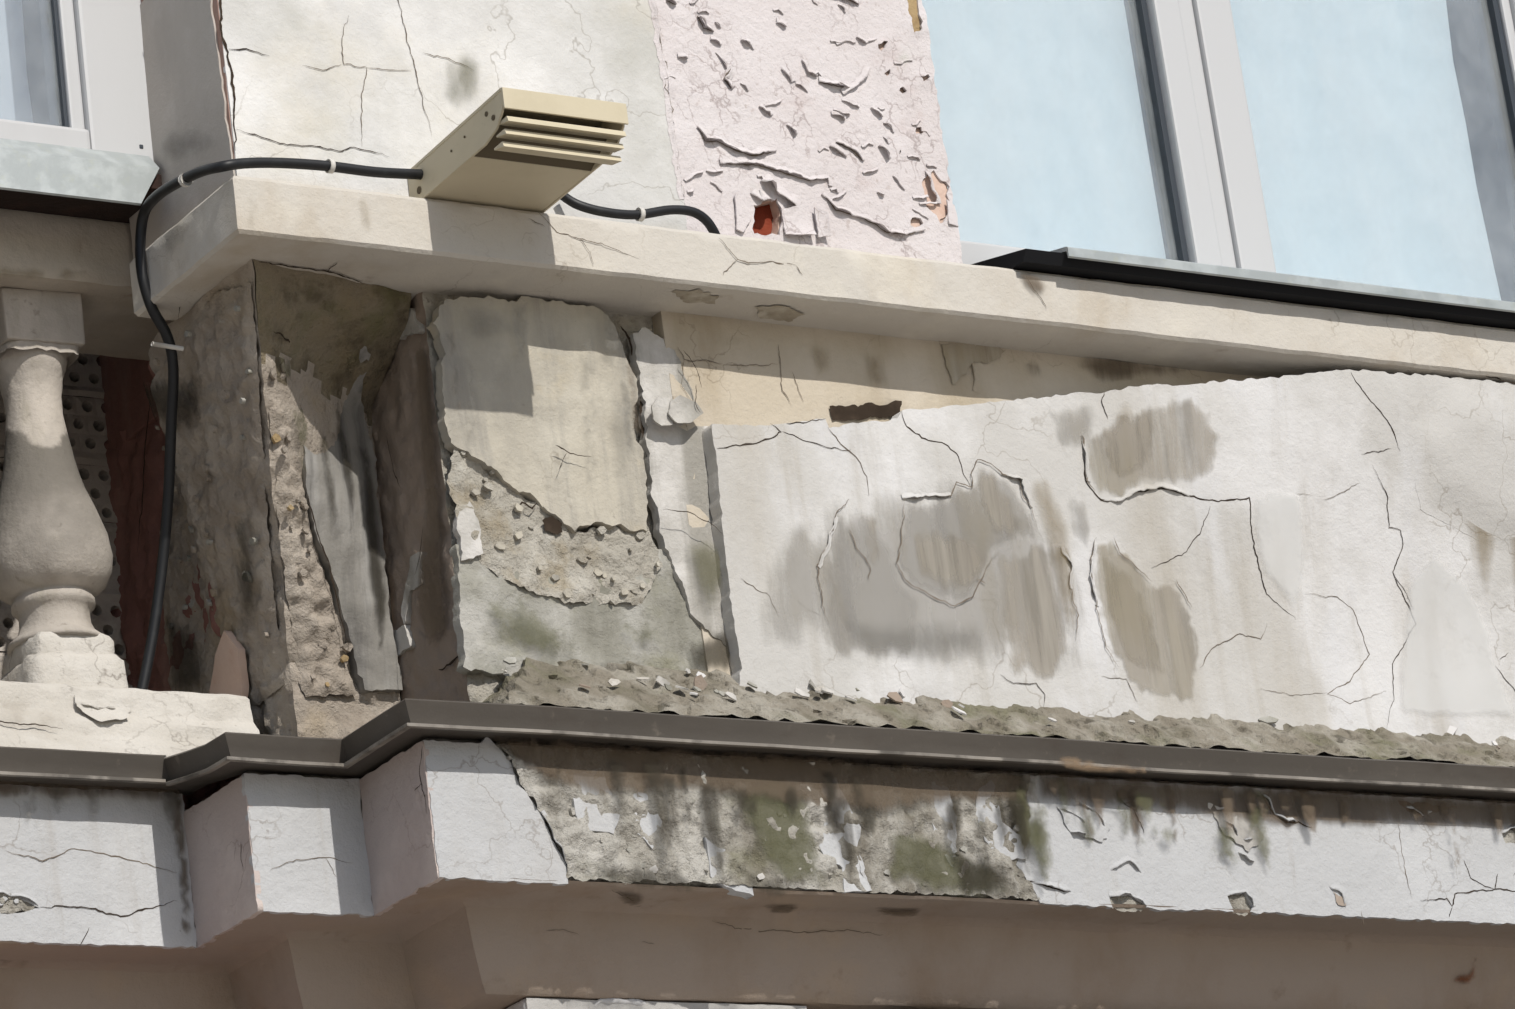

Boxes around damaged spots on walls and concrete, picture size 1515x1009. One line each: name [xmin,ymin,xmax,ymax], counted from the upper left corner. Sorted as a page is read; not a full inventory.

crack [219,0,471,156]
crack [648,0,685,199]
spalling [684,59,959,238]
spalling [150,283,358,707]
spalling [446,448,662,605]
peeling [651,395,703,426]
crack [902,415,970,485]
crack [1081,373,1416,725]
spalling [0,889,39,914]
crack [8,848,177,945]
spalling [495,745,1040,901]
leakage [510,742,1515,913]